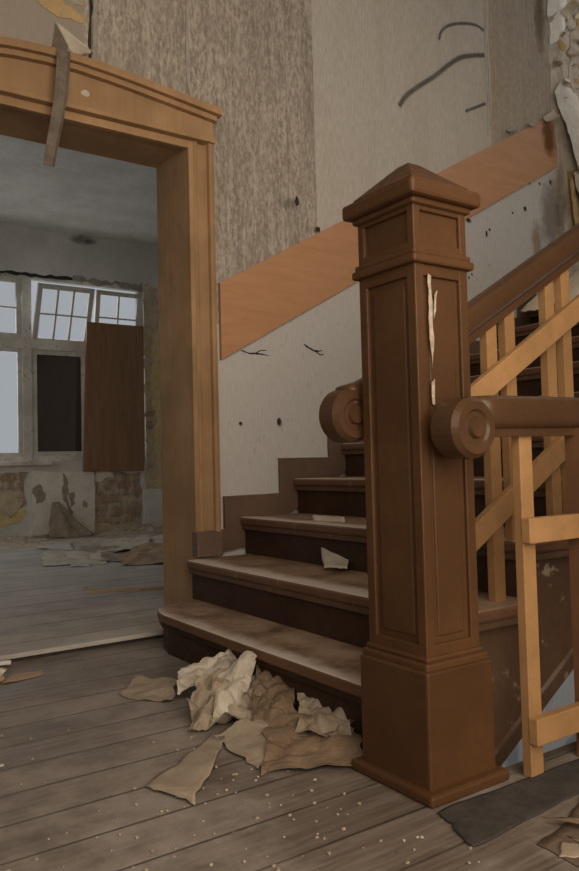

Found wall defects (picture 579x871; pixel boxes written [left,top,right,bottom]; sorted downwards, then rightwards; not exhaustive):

peeling [547,0,579,100]
spalling [0,472,46,529]
spalling [62,471,143,533]